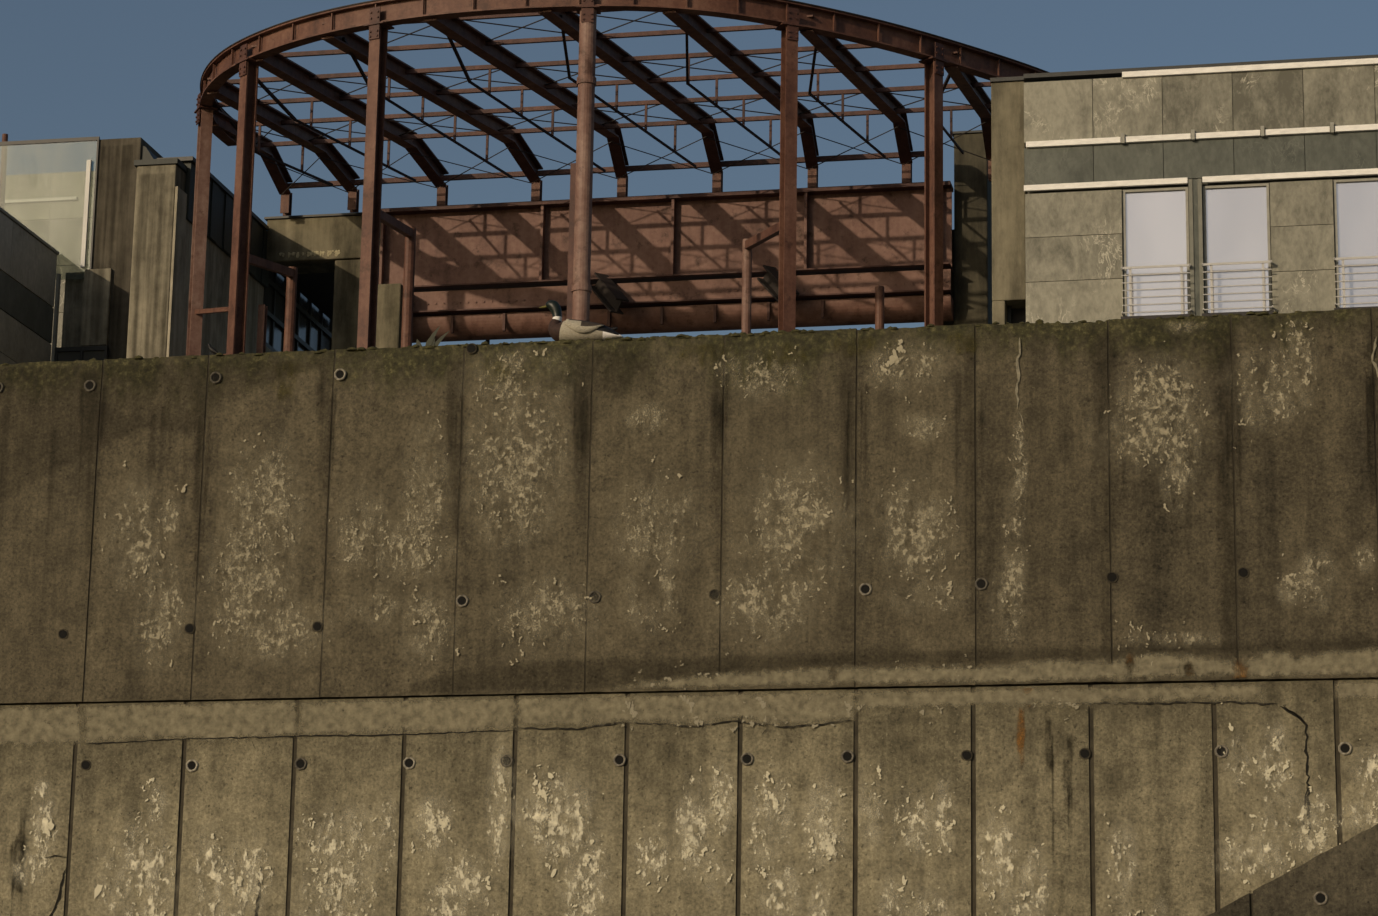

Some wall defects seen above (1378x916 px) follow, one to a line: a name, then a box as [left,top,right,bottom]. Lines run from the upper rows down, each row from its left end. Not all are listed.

crack [1370,337,1378,377]
crack [1077,701,1311,838]
crack [44,855,67,916]
crack [254,864,262,916]